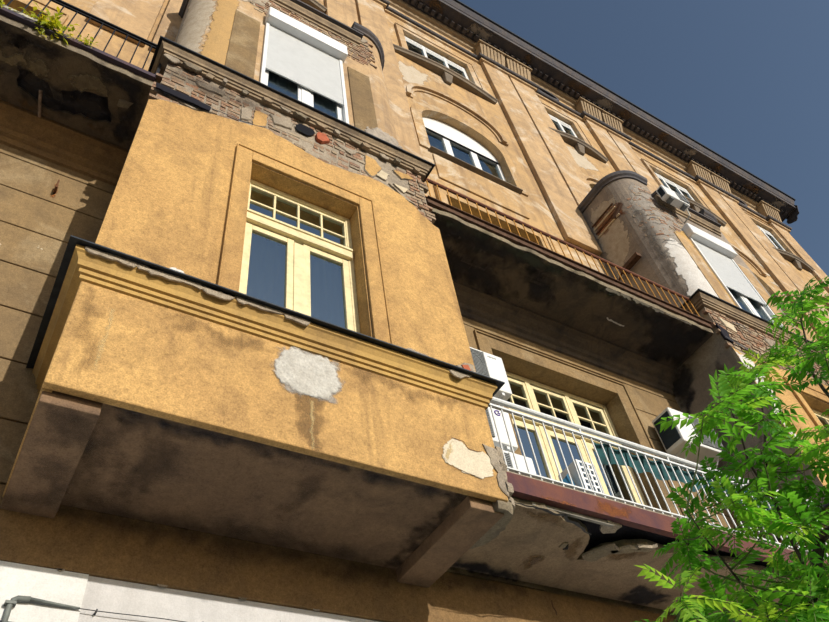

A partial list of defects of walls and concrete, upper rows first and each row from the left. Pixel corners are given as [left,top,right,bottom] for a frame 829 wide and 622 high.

peeling [174,0,217,53]
spalling [243,0,377,69]
spalling [0,49,133,122]
spalling [147,54,439,229]
water stain [437,220,577,301]
peeling [590,197,630,279]
peeling [664,238,719,298]
water stain [584,280,707,414]
spalling [442,437,515,549]
spalling [546,505,622,534]
spalling [582,543,658,562]